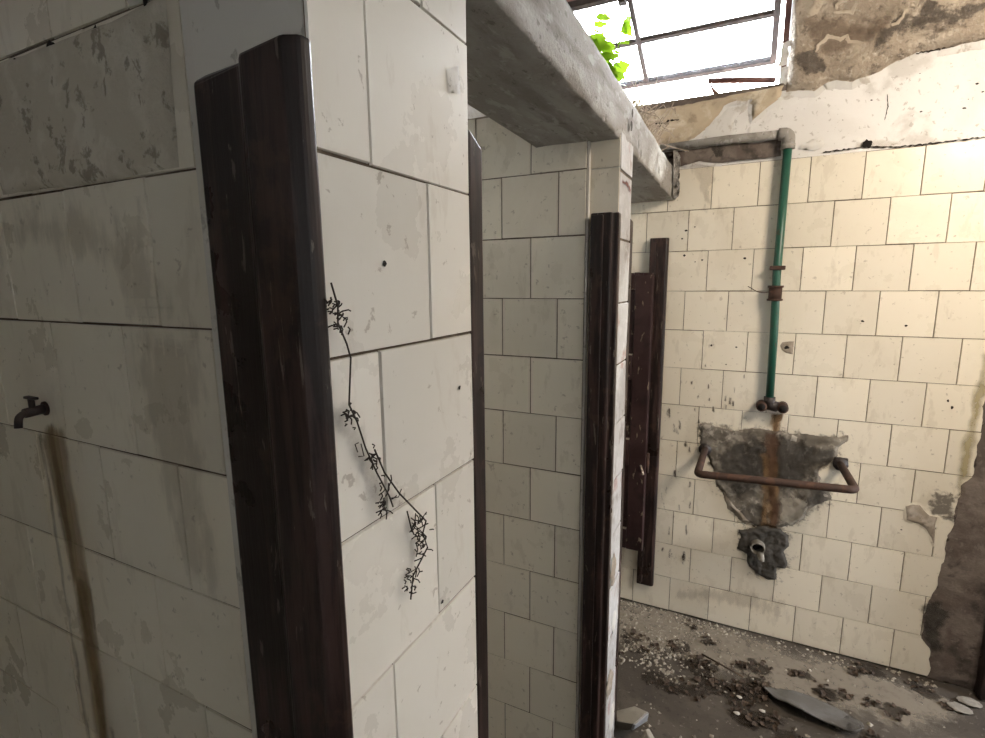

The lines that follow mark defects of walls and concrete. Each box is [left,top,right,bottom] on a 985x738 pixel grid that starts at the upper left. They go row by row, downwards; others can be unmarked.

damp [778,0,985,100]
damp [46,428,107,738]
corrosion [762,414,783,527]
peeling [698,422,848,580]
peeling [900,402,985,714]